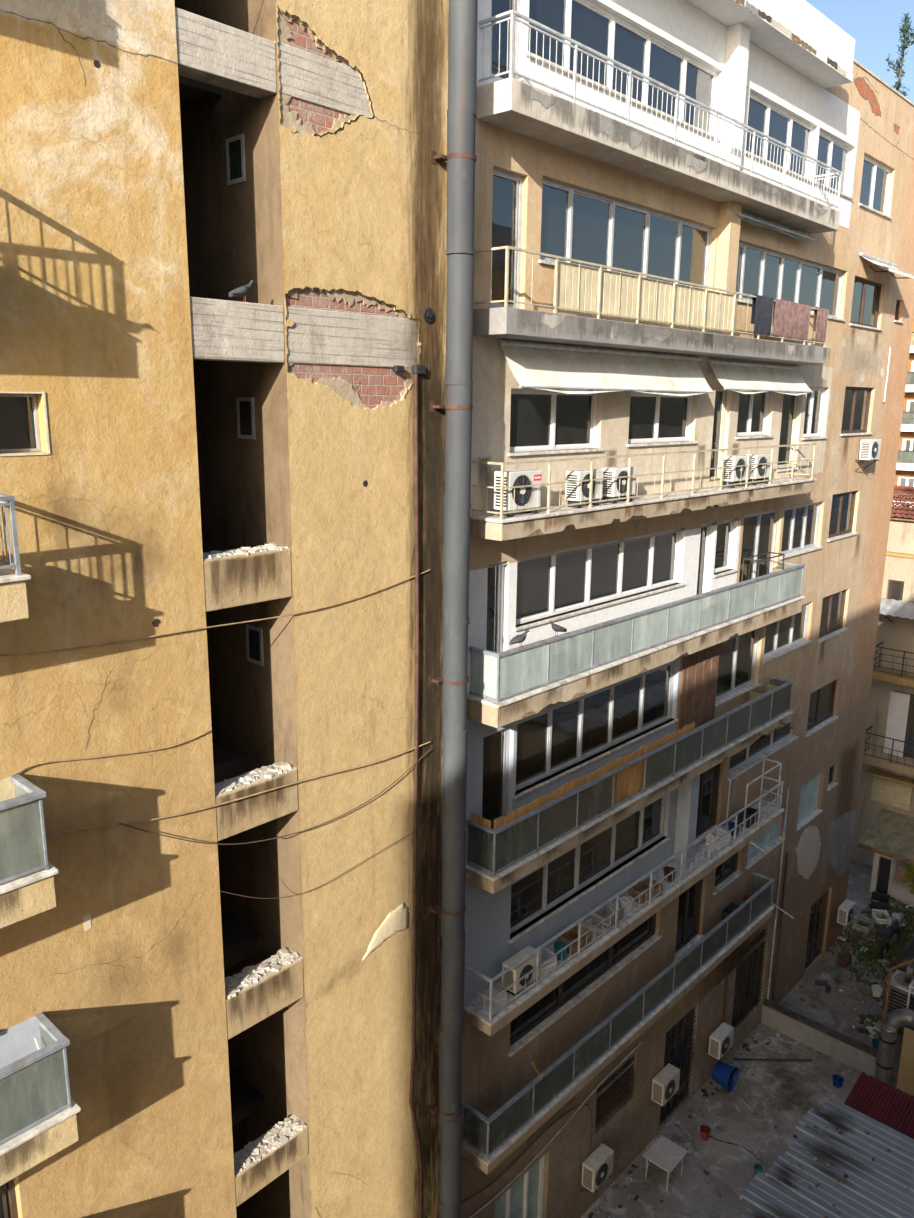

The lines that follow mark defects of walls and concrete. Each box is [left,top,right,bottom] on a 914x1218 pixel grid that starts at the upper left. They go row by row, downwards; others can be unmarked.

crack [1,10,177,85]
spalling [277,10,375,138]
spalling [736,0,900,135]
spalling [285,286,423,410]